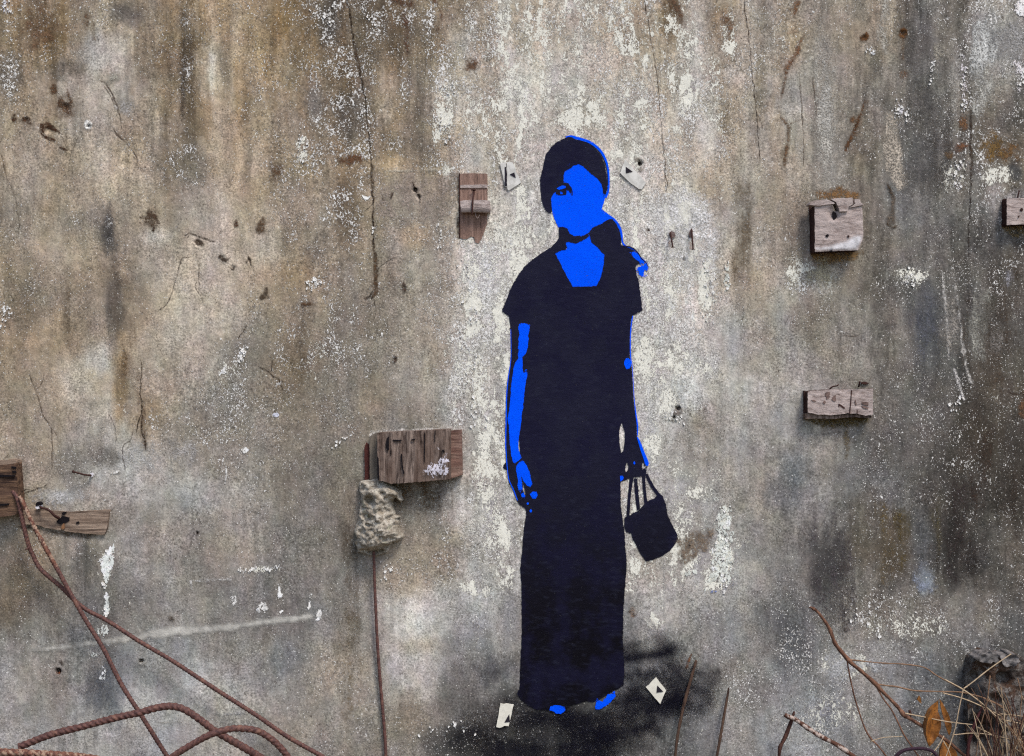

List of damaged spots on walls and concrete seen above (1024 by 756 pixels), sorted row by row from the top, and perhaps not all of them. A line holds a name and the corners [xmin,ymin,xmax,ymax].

corrosion [781,30,805,96]
crack [346,0,409,318]
corrosion [844,101,868,151]
corrosion [981,133,1018,162]
corrosion [816,186,858,199]
crack [109,363,146,466]